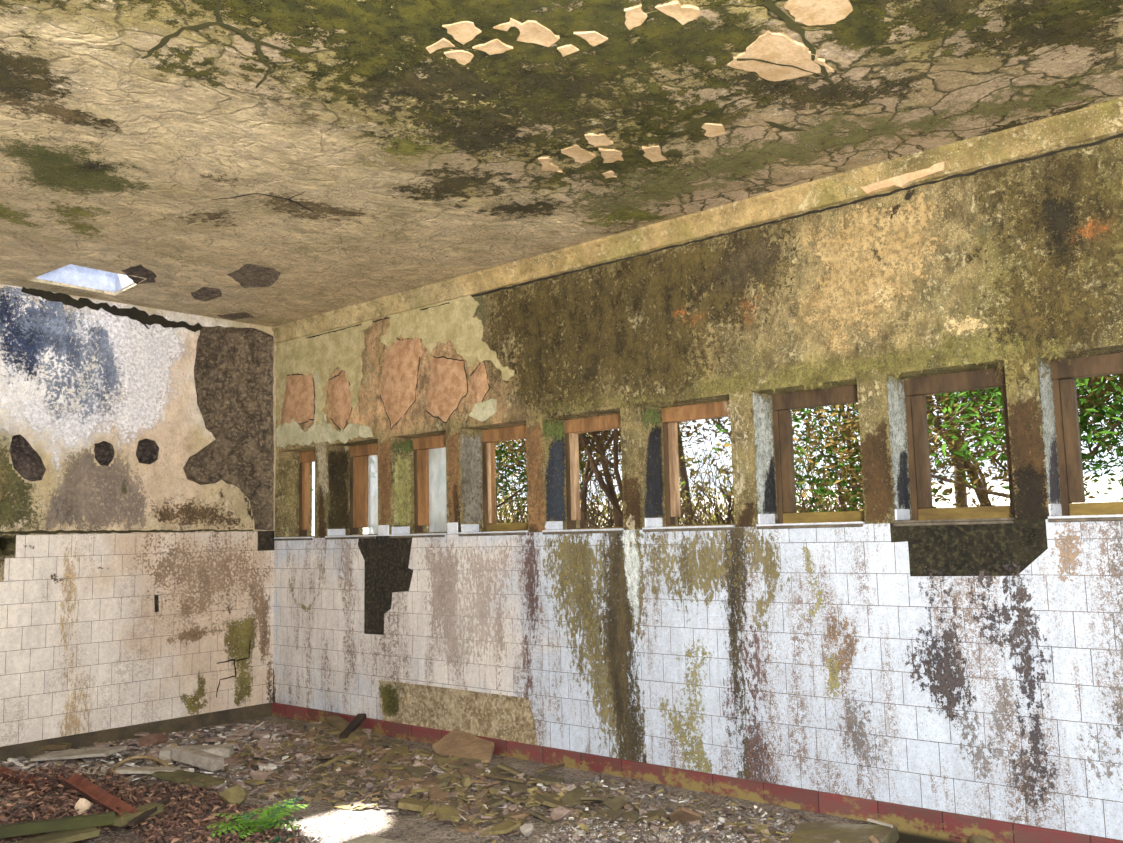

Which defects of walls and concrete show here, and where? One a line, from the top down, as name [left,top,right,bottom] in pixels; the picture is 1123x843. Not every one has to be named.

peeling [426,17,608,65]
peeling [727,30,834,81]
damp [0,286,273,646]
crack [307,317,389,338]
spalling [183,295,515,551]
peeling [358,535,413,635]
damp [417,183,956,784]
crack [420,133,1123,310]
peeling [890,519,1048,576]
damp [902,563,1060,809]
damp [942,139,1123,542]
damp [1079,521,1123,790]